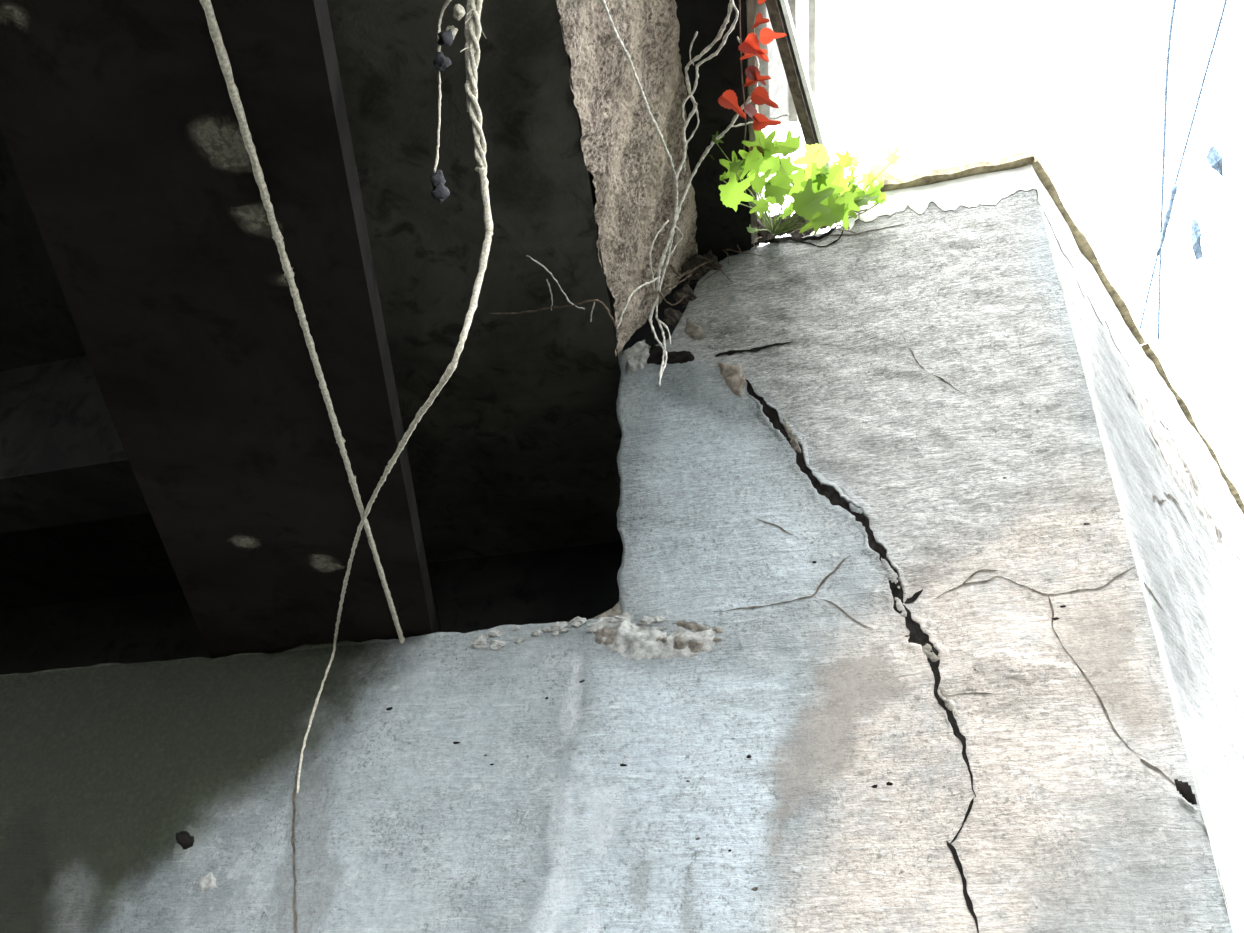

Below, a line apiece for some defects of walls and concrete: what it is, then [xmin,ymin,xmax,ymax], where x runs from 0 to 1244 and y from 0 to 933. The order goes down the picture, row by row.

damp [193,121,249,169]
damp [237,205,271,231]
crack [900,331,965,395]
damp [232,537,255,548]
damp [313,555,342,571]
spalling [470,612,724,660]
crack [712,371,1175,933]